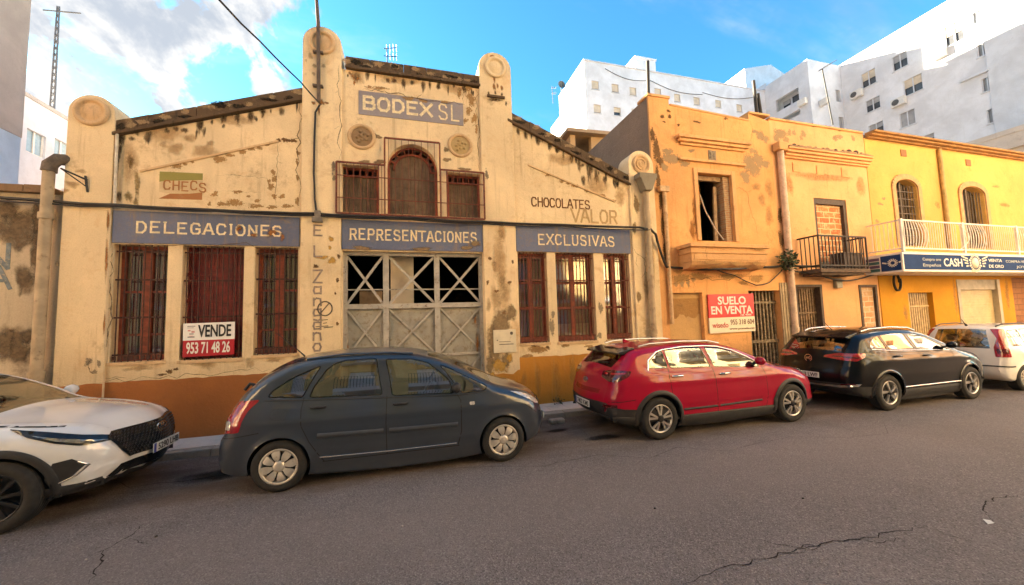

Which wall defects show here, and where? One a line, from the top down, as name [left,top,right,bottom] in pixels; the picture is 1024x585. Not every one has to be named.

water stain [347,72,474,96]
water stain [117,102,300,204]
water stain [516,129,623,197]
spalling [650,109,695,260]
peeling [740,123,826,199]
peeling [487,305,569,374]